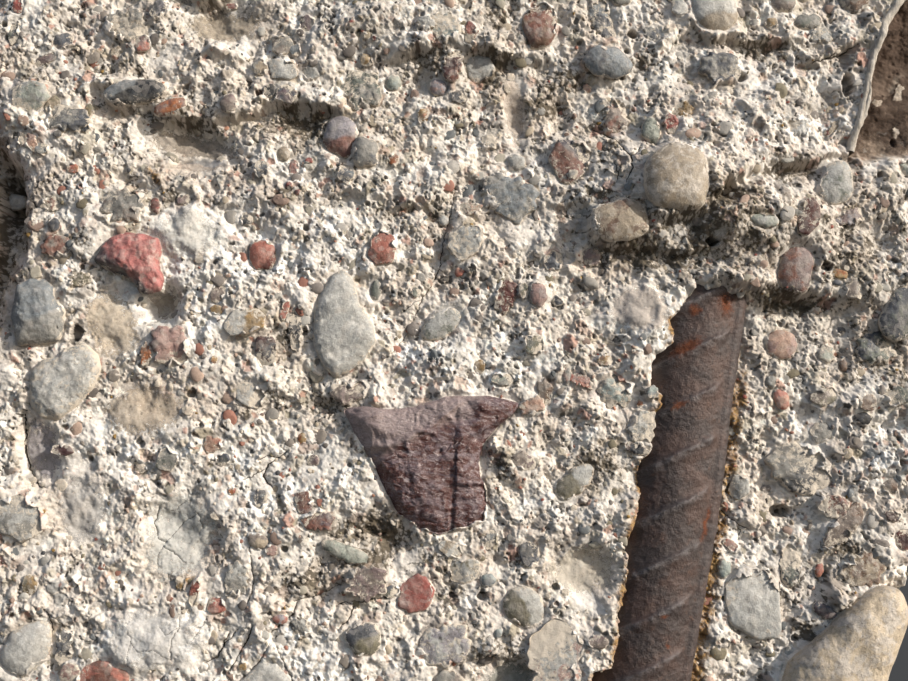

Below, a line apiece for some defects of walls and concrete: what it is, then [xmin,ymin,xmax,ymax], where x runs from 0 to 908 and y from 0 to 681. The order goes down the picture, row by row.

spalling [845,0,908,157]
crack [154,503,203,565]
spalling [549,545,614,596]
spalling [592,283,747,681]
corrosion [691,372,747,681]